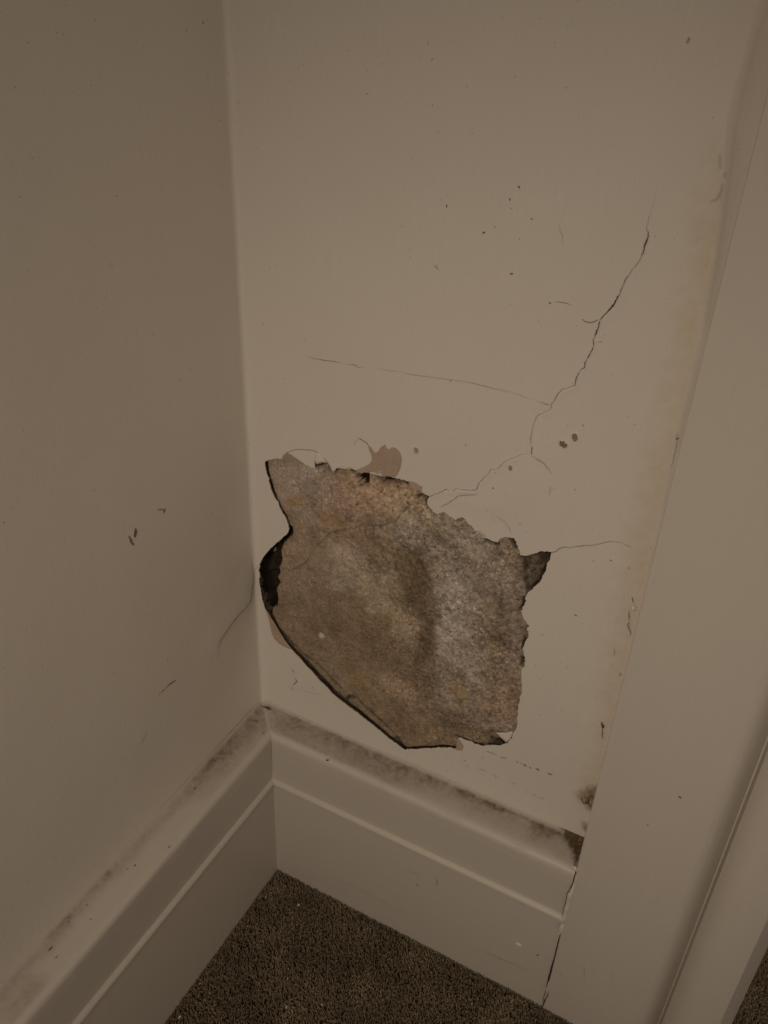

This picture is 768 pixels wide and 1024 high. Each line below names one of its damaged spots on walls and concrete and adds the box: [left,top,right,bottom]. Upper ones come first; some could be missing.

crack [429,232,655,500]
spalling [259,438,551,751]
crack [542,859,578,1008]
leakage [565,829,584,859]